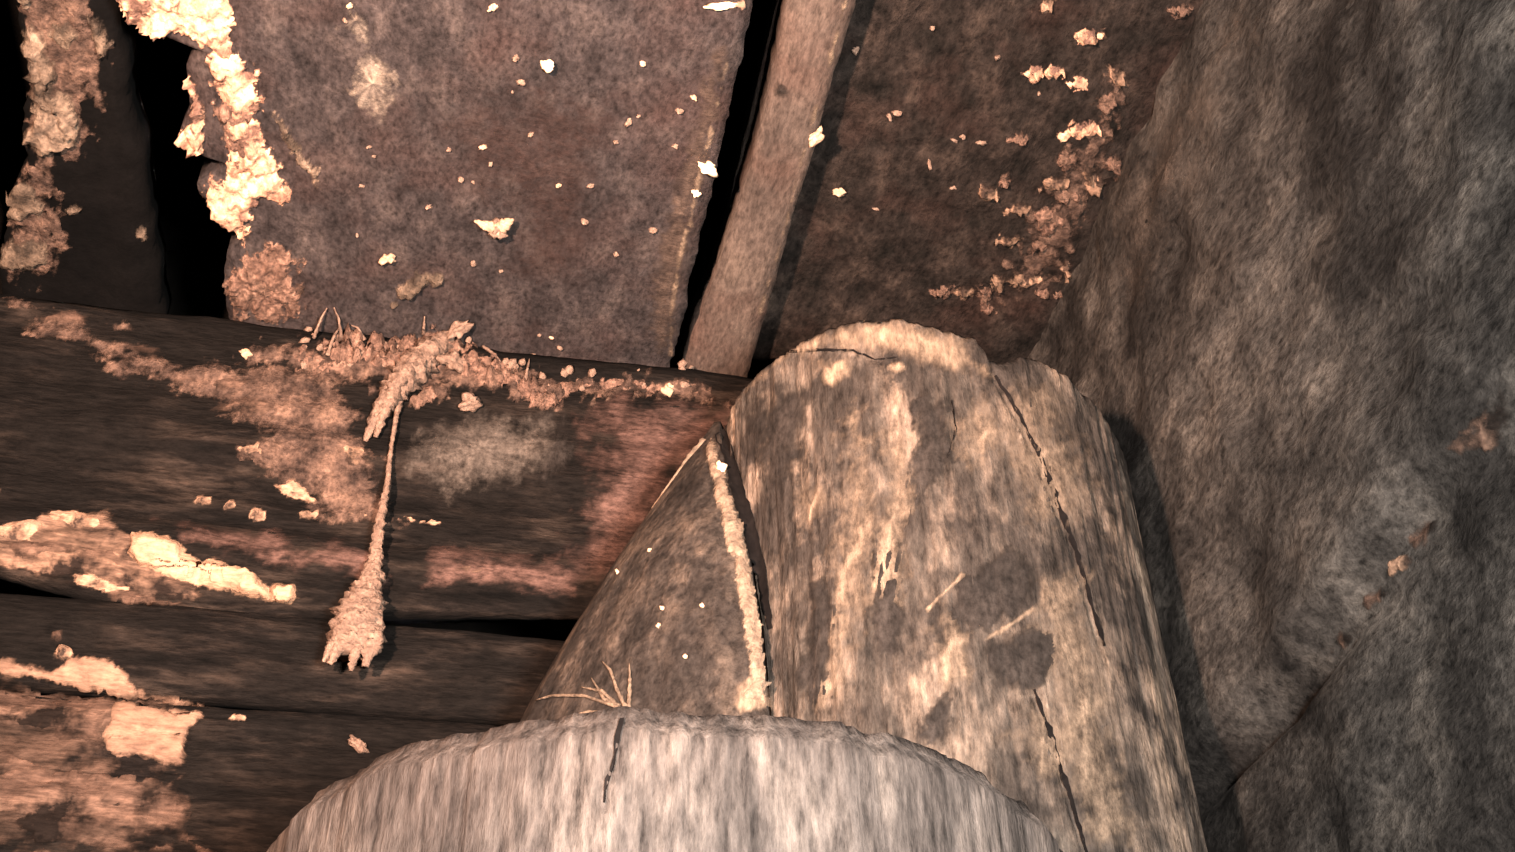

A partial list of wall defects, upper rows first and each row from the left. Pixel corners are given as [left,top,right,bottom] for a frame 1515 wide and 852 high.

peeling [0,510,296,606]
crack [652,429,772,702]
peeling [0,631,210,852]
crack [603,717,624,803]